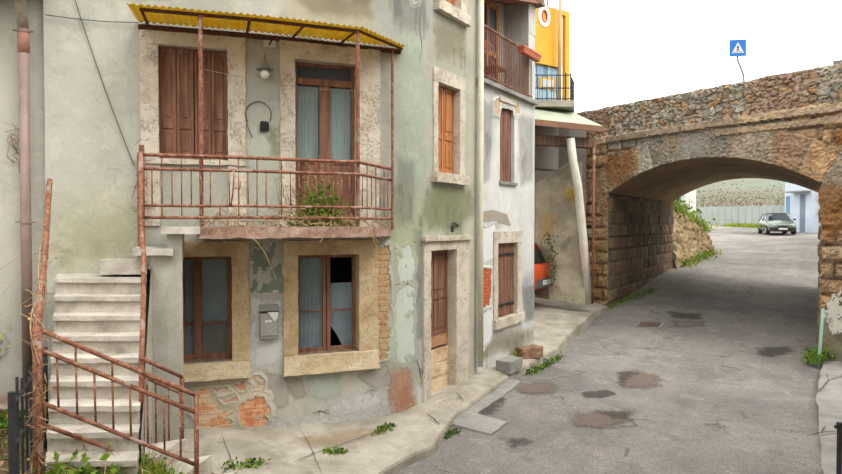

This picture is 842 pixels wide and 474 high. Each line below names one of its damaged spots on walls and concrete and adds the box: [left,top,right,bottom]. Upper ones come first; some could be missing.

peeling [249,238,287,299]
peeling [378,239,419,370]
spalling [477,221,498,352]
peeling [184,366,277,429]